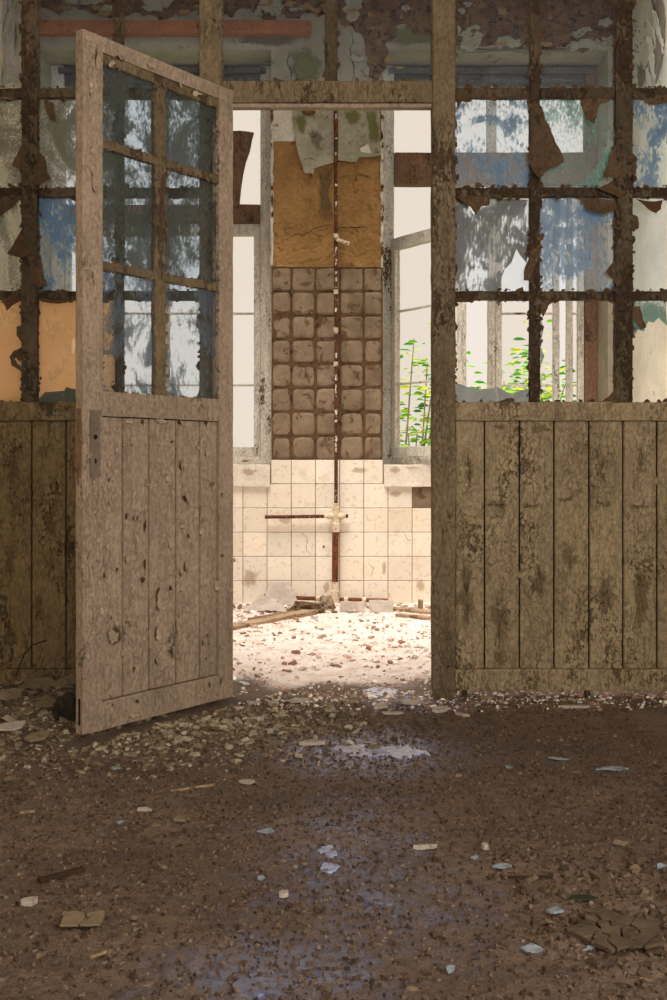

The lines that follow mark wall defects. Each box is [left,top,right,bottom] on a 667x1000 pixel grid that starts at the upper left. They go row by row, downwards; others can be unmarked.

flaking render [337,0,431,80]
flaking render [455,0,613,54]
peeling [506,94,564,178]
peeling [580,98,612,124]
crack [283,168,367,240]
peeling [579,145,639,231]
peeling [637,199,663,213]
peeling [270,110,384,460]